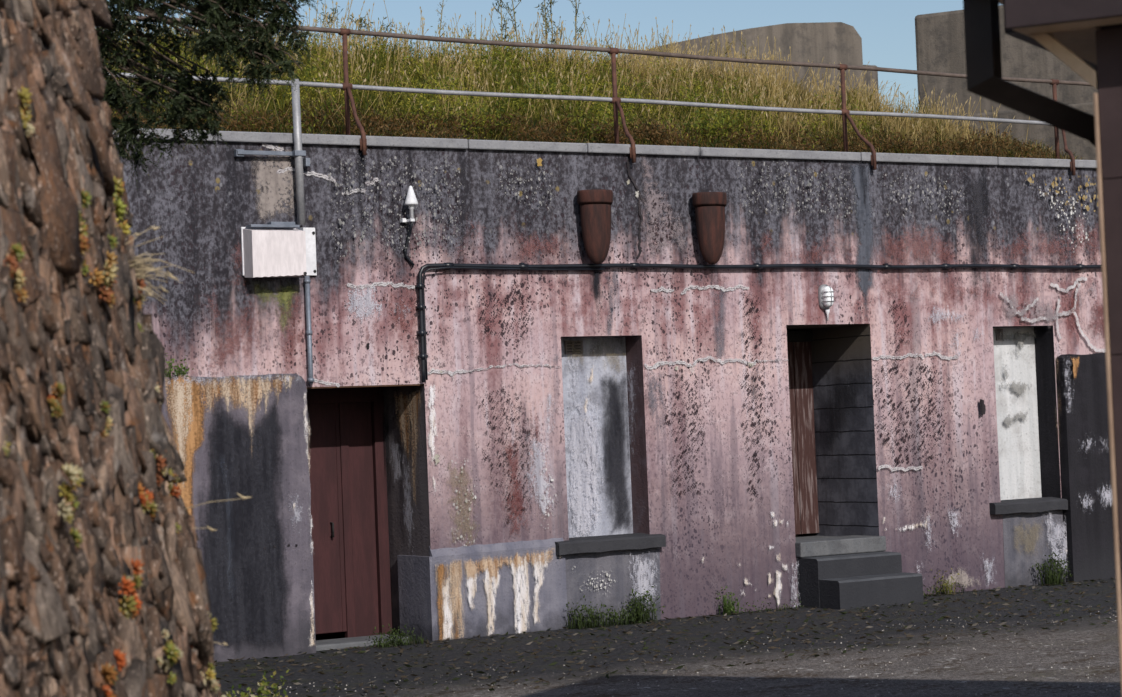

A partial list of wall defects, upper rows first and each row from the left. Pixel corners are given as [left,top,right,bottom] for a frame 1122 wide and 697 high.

water stain [851,165,874,304]
crack [1000,277,1105,353]
rust [165,372,301,515]
water stain [565,353,657,537]
water stain [201,400,313,647]
rust [435,550,561,640]
peeling [768,546,788,605]